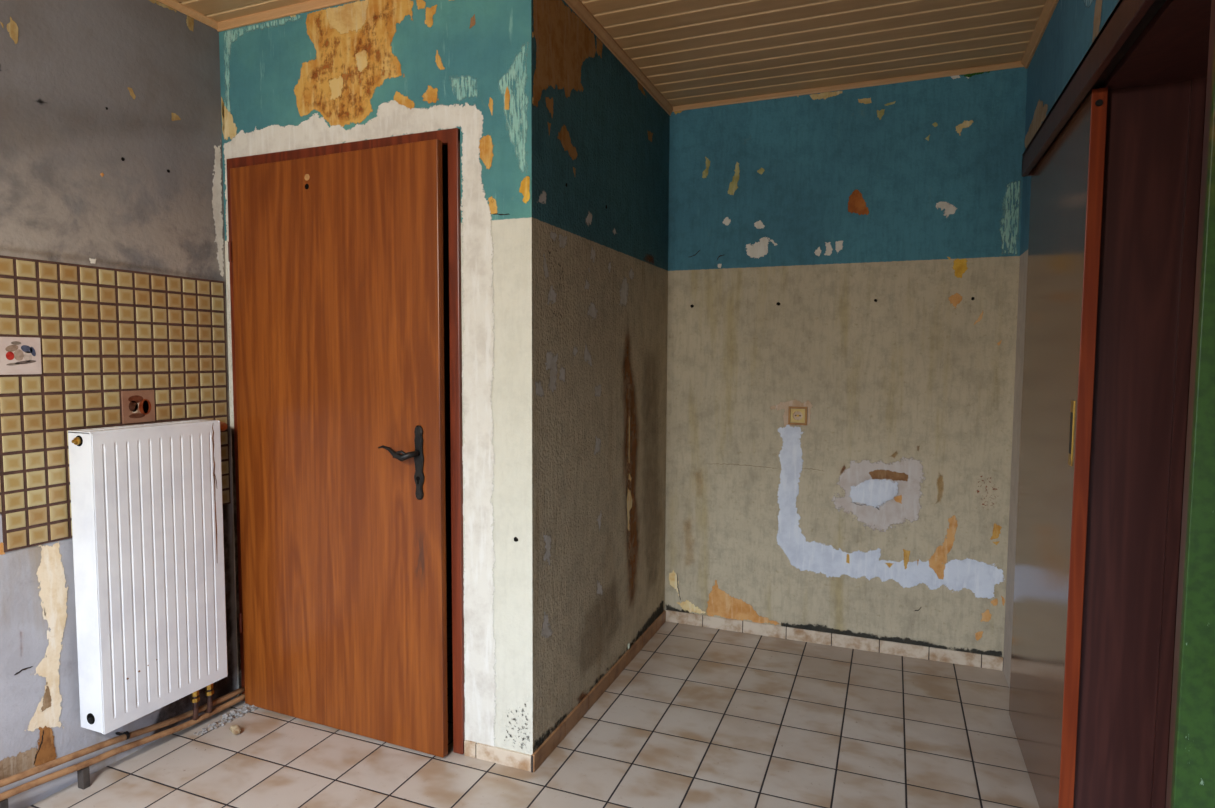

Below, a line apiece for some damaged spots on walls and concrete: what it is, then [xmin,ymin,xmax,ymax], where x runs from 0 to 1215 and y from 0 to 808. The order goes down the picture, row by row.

peeling [290,0,451,127]
peeling [532,0,603,175]
peeling [858,97,896,120]
peeling [956,120,974,135]
peeling [728,162,740,195]
peeling [848,189,869,216]
flaking render [832,457,926,532]
peeling [929,515,958,579]
peeling [669,570,782,625]
peeling [0,541,69,780]